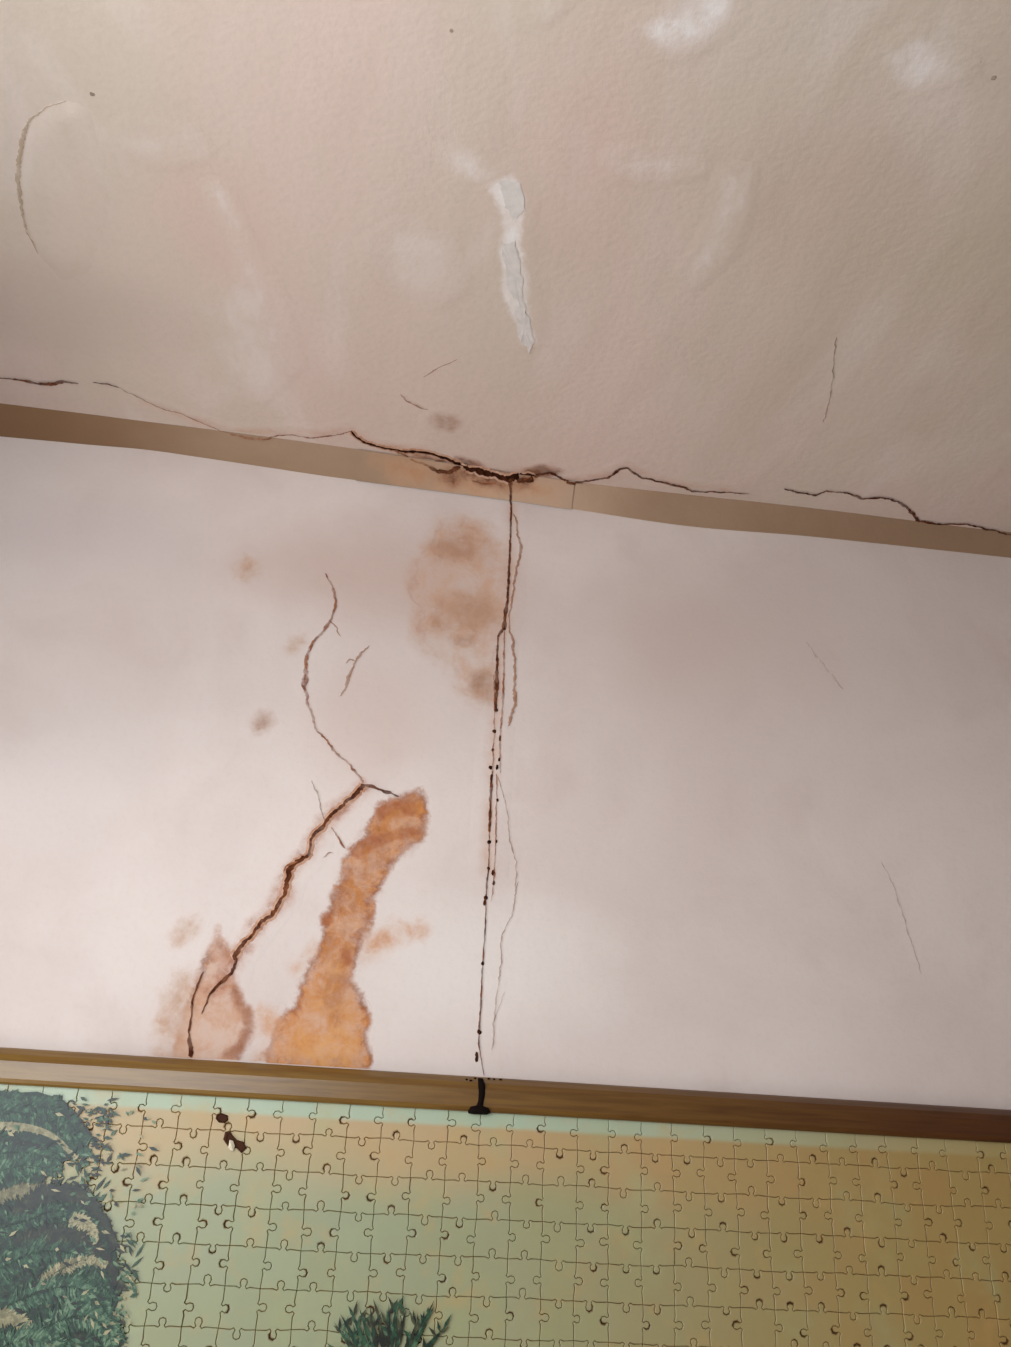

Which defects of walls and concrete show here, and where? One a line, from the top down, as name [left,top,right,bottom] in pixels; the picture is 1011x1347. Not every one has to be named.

peeling [431,139,553,355]
leakage [356,404,574,720]
crack [784,489,1011,535]
crack [0,359,747,1074]
corrosion [254,775,446,1070]